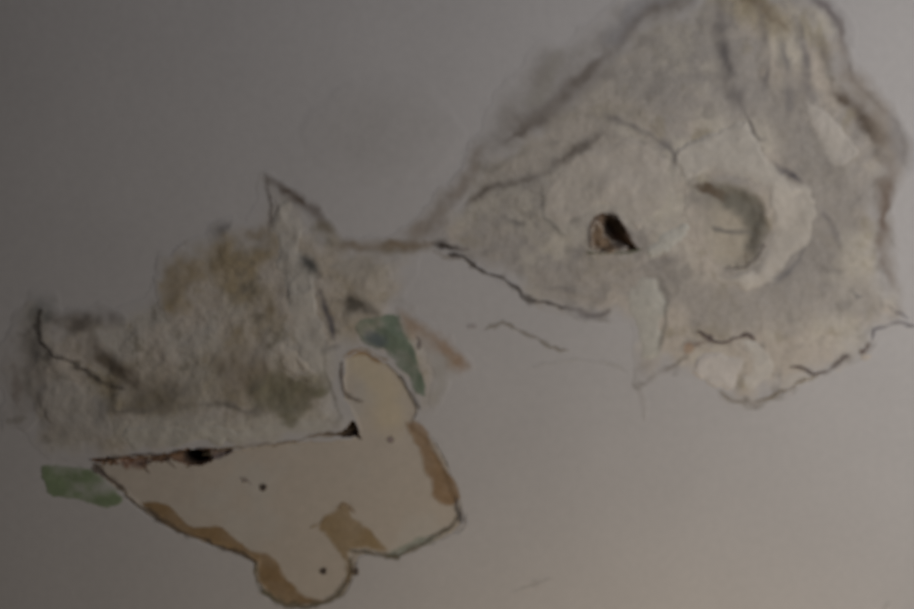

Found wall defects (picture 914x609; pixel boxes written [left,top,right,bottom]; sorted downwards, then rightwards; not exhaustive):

spalling [439,0,914,411]
water stain [152,243,211,322]
crack [433,236,612,323]
water stain [0,305,59,433]
crack [10,288,153,399]
water stain [120,370,209,421]
spalling [22,169,466,609]
water stain [208,343,334,431]
crack [635,331,755,421]